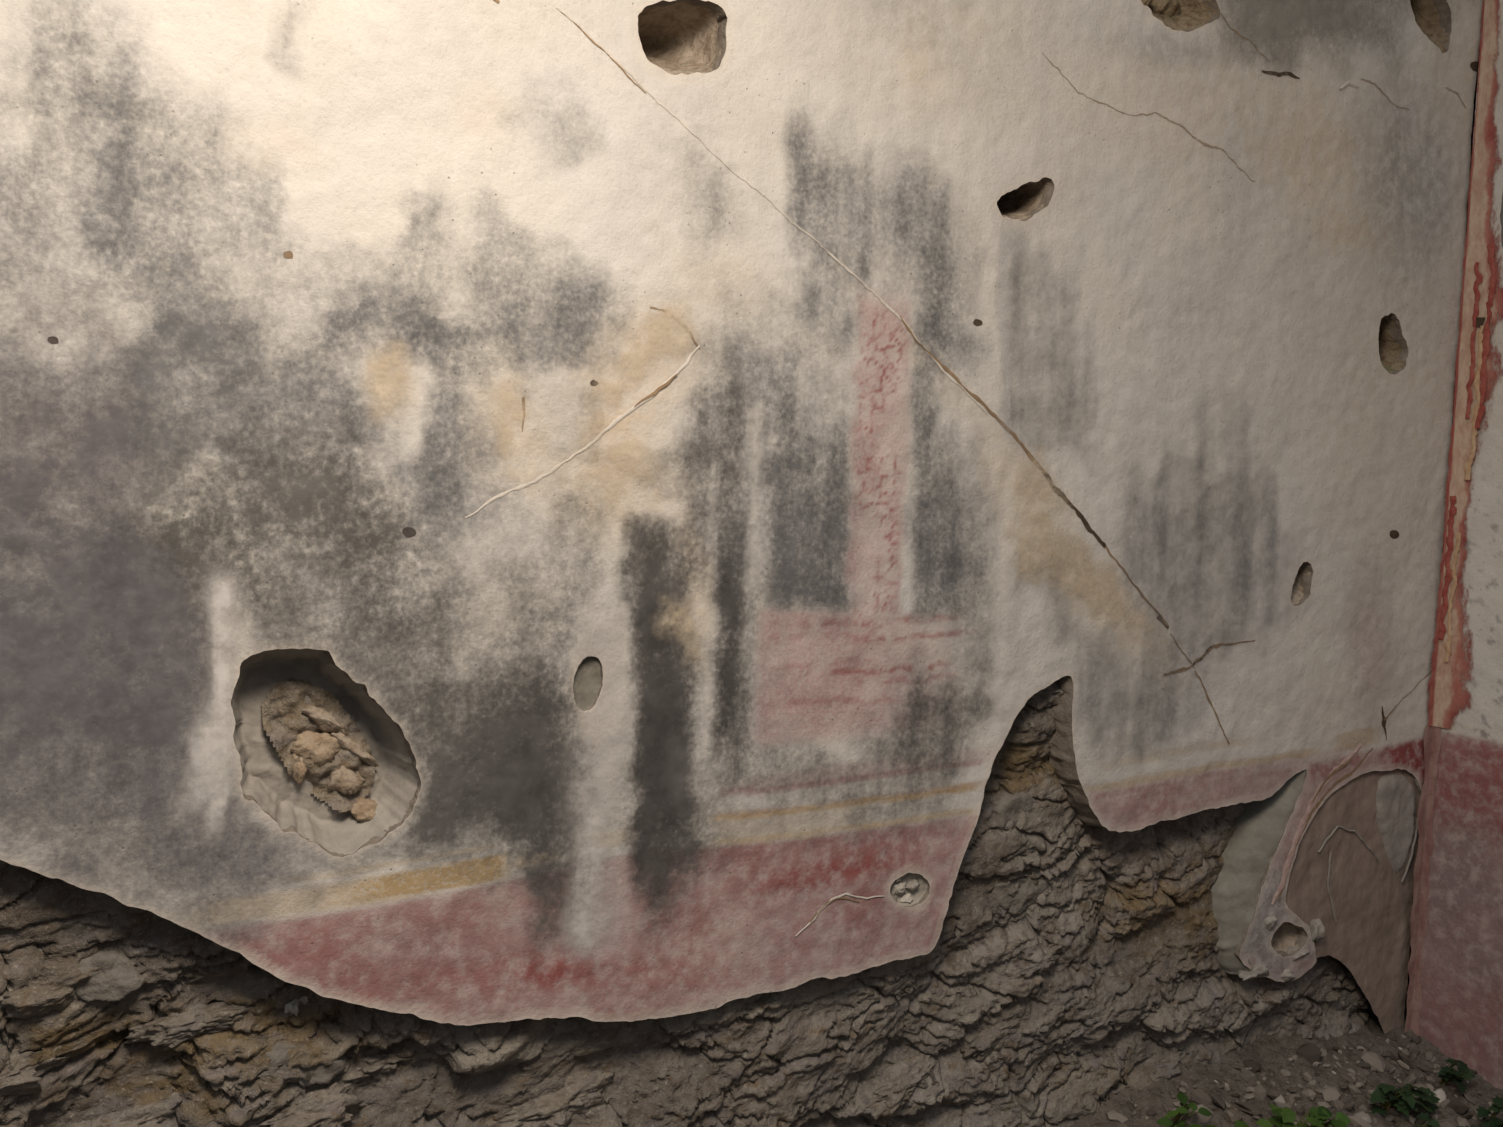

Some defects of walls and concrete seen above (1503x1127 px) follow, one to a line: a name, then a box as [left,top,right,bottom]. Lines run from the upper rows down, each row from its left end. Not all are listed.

water stain [78,80,187,254]
spalling [231,648,420,855]
water stain [0,253,702,952]
spalling [573,656,602,710]
water stain [684,387,746,508]
water stain [712,511,748,780]
water stain [749,358,847,609]
crack [556,7,1256,745]
water stain [877,693,989,787]
water stain [913,460,983,613]
peeling [1286,0,1503,1036]
spalling [0,680,1372,1127]